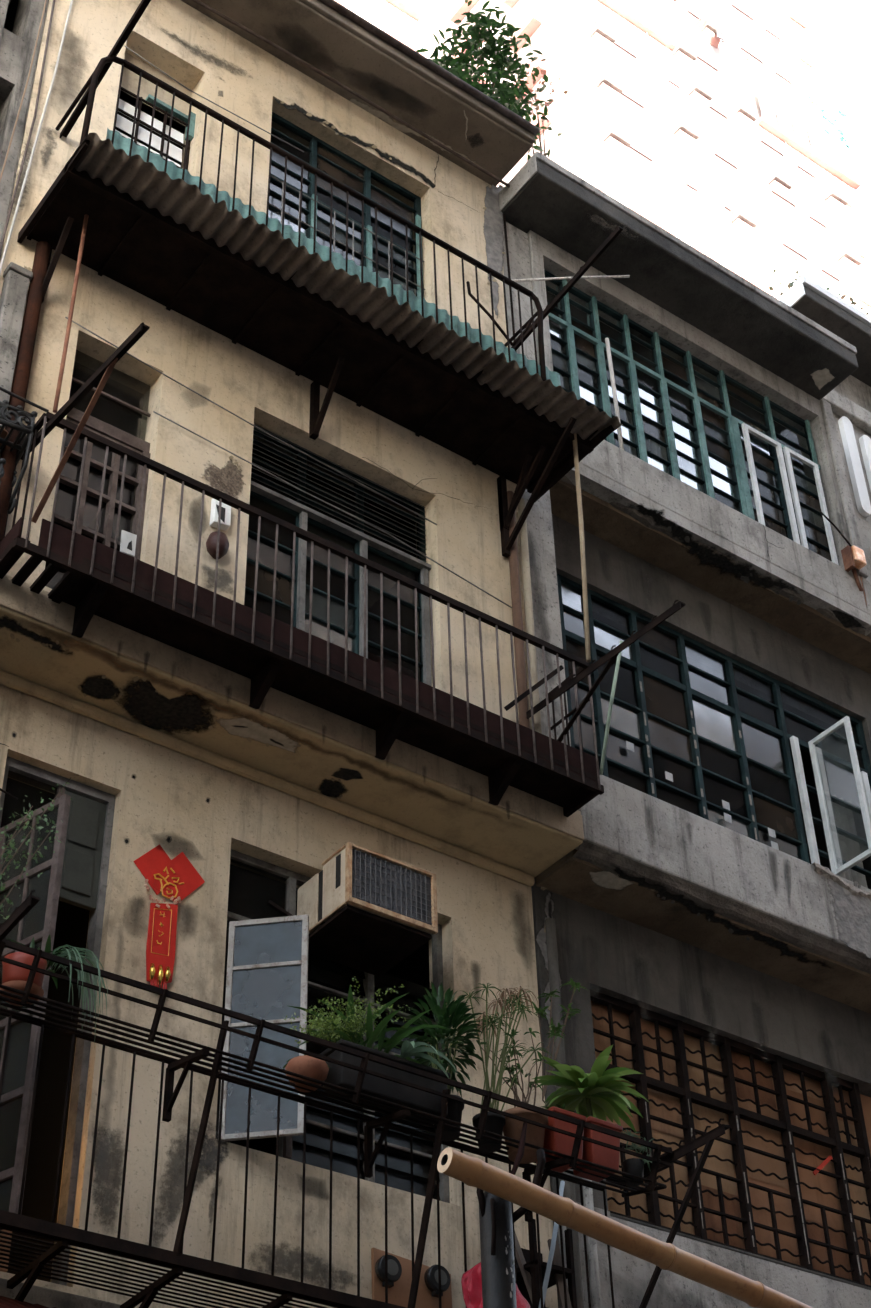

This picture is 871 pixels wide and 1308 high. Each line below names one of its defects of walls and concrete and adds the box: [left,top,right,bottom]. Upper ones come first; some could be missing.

flaking render [274,98,436,188]
leakage [34,624,463,805]
leakage [93,1129,124,1225]
leakage [153,1126,227,1241]